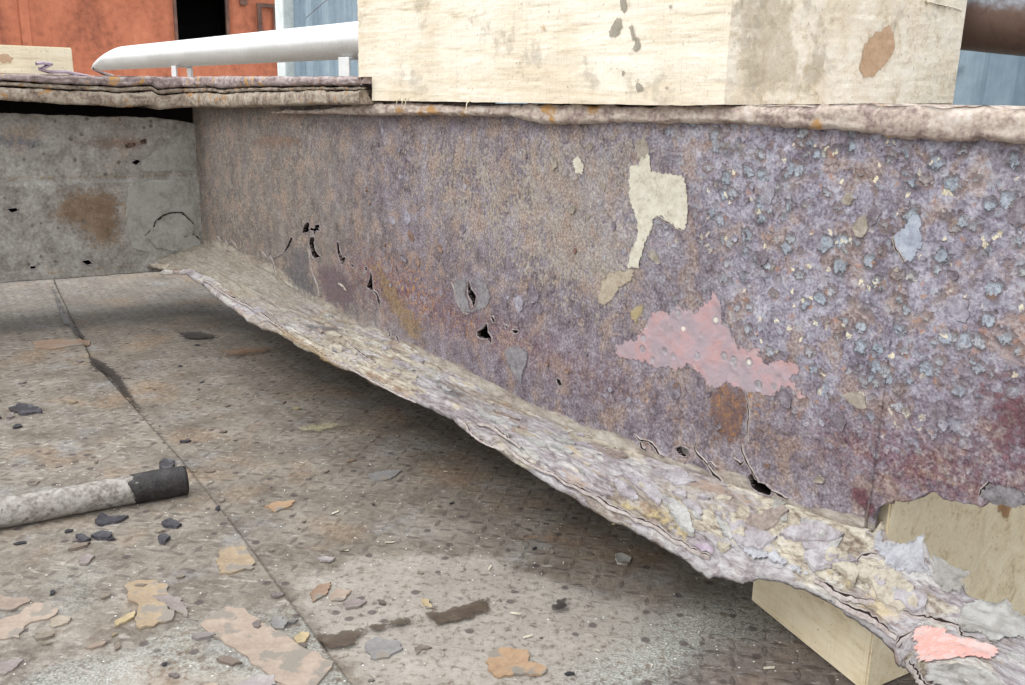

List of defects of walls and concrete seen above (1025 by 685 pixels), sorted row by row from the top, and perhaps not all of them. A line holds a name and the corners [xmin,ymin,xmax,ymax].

crack [145,212,237,248]
crack [262,247,319,296]
rust [317,264,355,308]
peeling [596,137,689,305]
peeling [615,291,805,408]
crack [462,419,710,560]
peeling [475,400,859,588]
rust [709,383,749,444]
crack [693,390,788,500]
rust [851,487,875,515]
rust [981,484,1025,508]
peeling [866,530,1025,685]